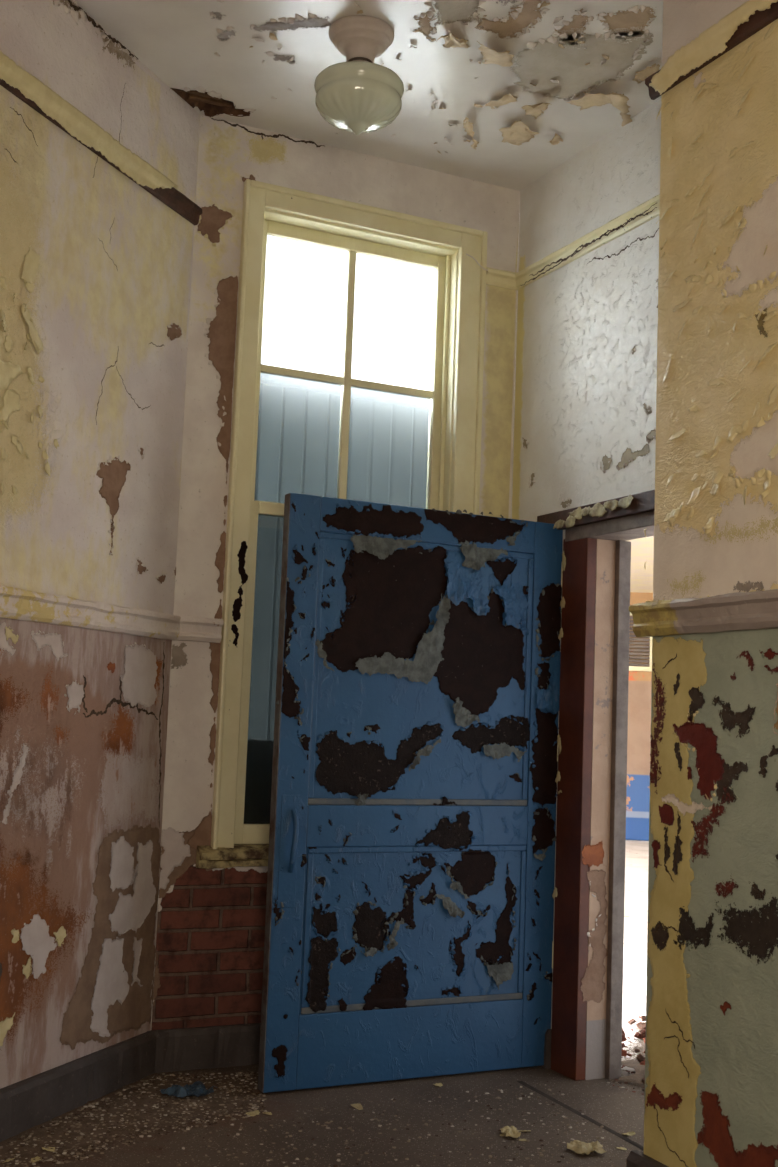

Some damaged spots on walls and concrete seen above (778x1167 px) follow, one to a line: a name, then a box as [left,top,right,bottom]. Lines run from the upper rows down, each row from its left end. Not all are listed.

crack [211,118,324,147]
peeling [249,14,331,65]
peeling [410,0,660,155]
spalling [96,448,145,555]
spalling [203,276,248,788]
spalling [600,428,656,473]
peeling [644,385,778,602]
crack [82,650,165,827]
peeling [650,648,778,875]
flaking render [60,804,285,1050]
peeling [650,873,778,964]
peeling [697,1090,778,1167]